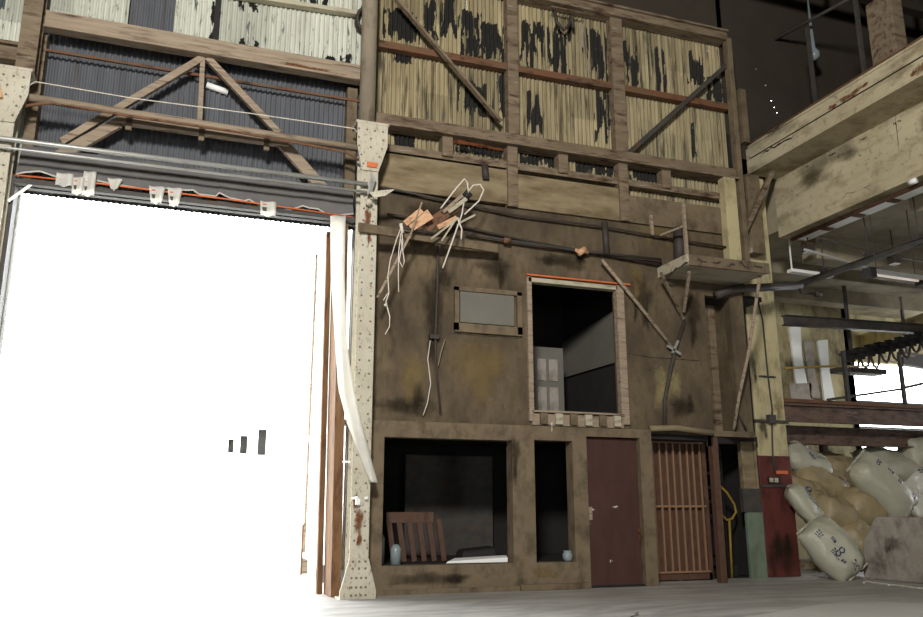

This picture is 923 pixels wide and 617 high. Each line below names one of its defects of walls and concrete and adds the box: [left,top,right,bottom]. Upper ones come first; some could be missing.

peeling [393,54,412,64]
peeling [382,0,504,62]
peeling [457,73,505,119]
peeling [526,90,543,135]
peeling [519,20,572,75]
peeling [585,26,611,144]
peeling [623,40,639,87]
peeling [392,134,415,148]
rust [353,494,363,545]